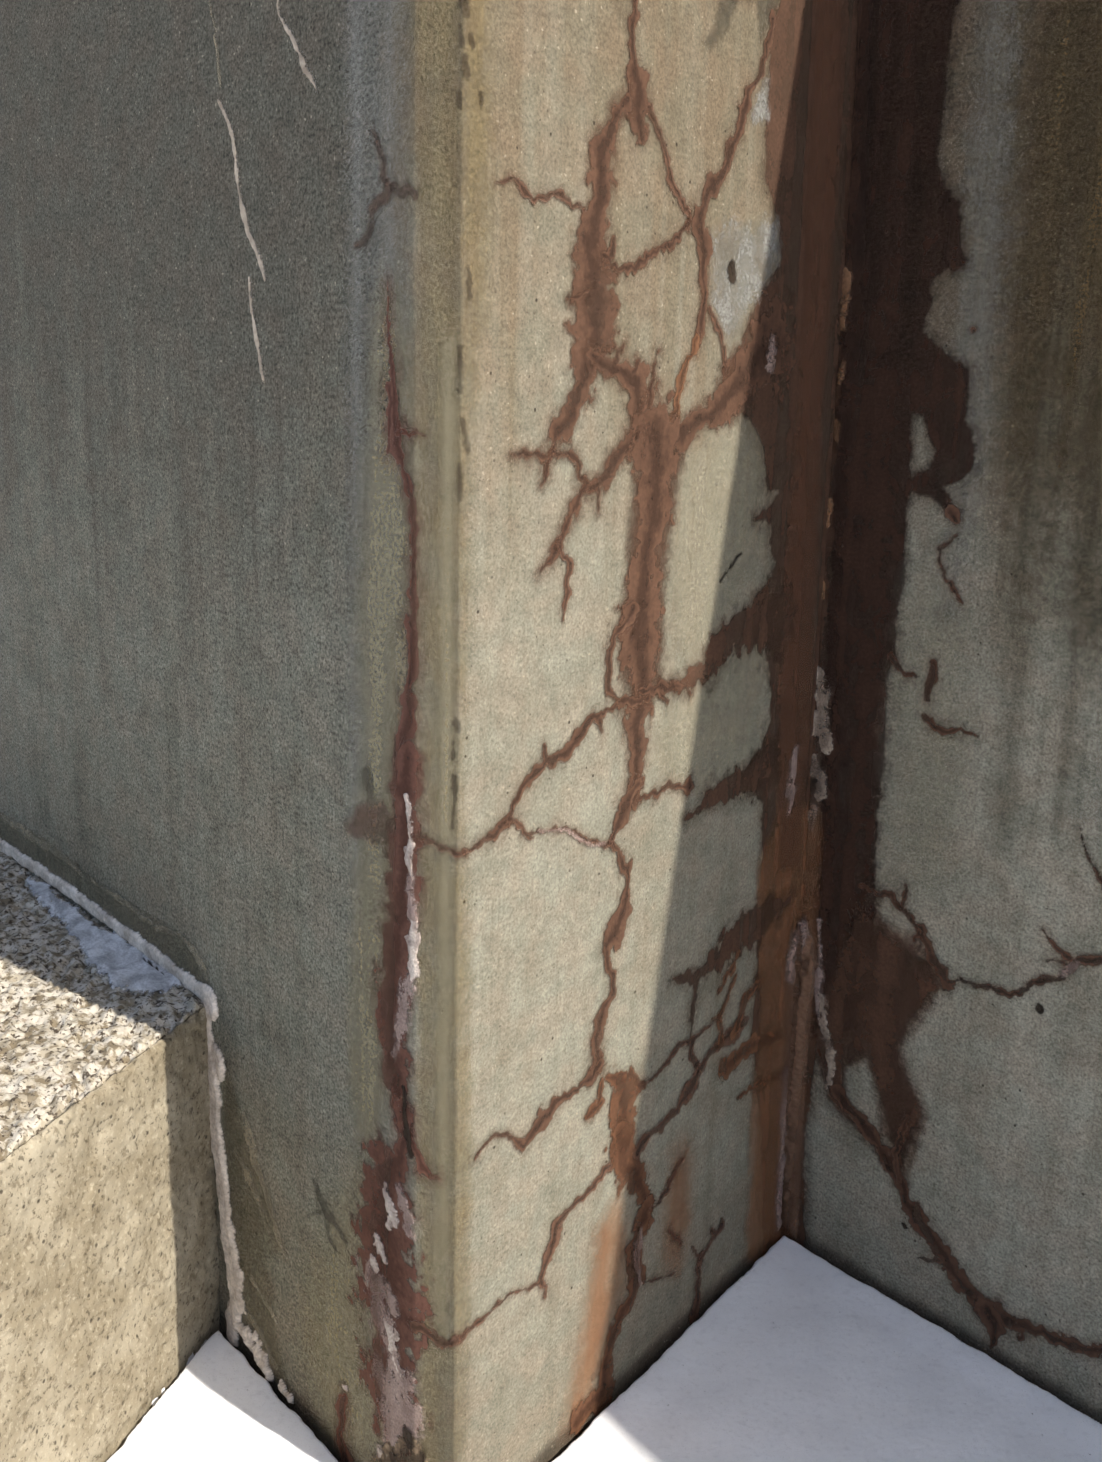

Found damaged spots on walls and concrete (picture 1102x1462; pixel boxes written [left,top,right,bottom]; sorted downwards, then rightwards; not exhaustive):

crack [276,0,316,89]
crack [217,99,265,381]
damp [766,336,777,373]
damp [840,267,852,332]
damp [826,496,834,528]
corrosion [657,0,976,1258]
crack [313,0,797,1443]
damp [787,665,833,830]
crack [858,883,1102,999]
damp [776,917,836,1239]
crack [830,1083,1102,1358]
spalling [371,1427,428,1462]